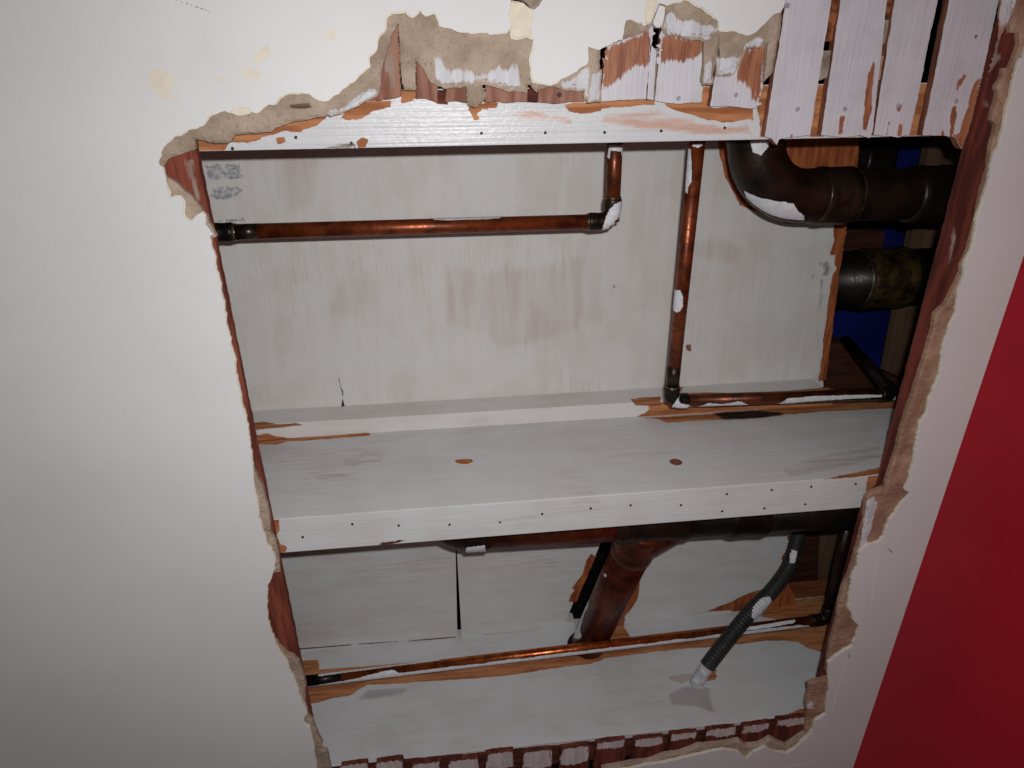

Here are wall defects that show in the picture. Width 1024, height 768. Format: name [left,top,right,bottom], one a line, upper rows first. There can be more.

flaking render [160,0,782,238]
flaking render [254,463,287,573]
peeling [254,422,370,445]
peeling [569,554,596,602]
flaking render [589,0,1024,768]
peeling [276,584,718,768]